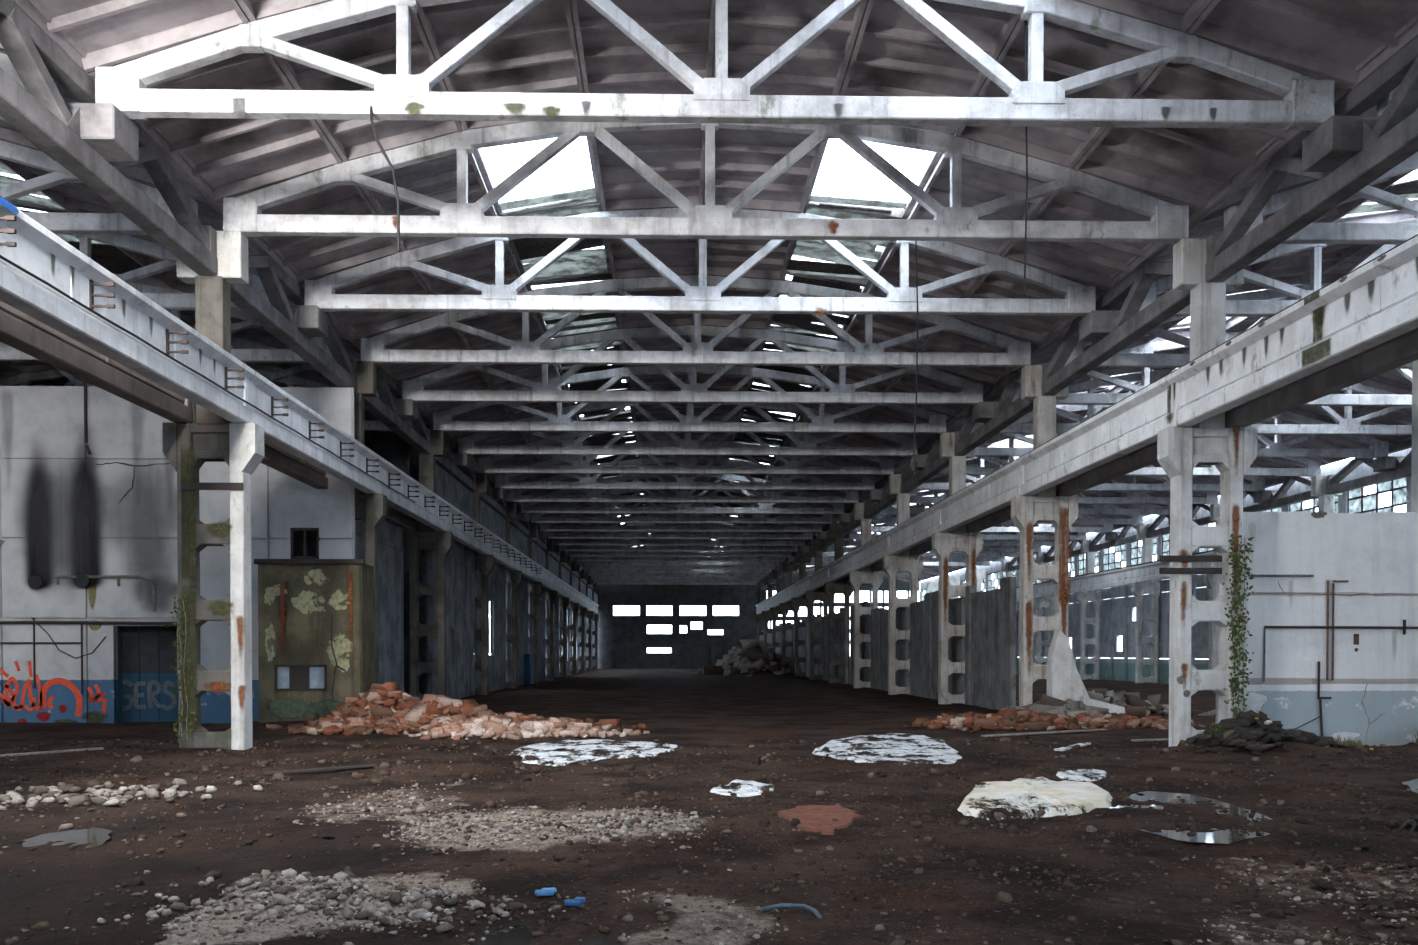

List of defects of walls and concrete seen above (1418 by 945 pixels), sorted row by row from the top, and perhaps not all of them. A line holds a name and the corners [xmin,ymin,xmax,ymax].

water stain [27,461,52,587]
water stain [73,454,102,630]
corrosion [1059,508,1070,636]